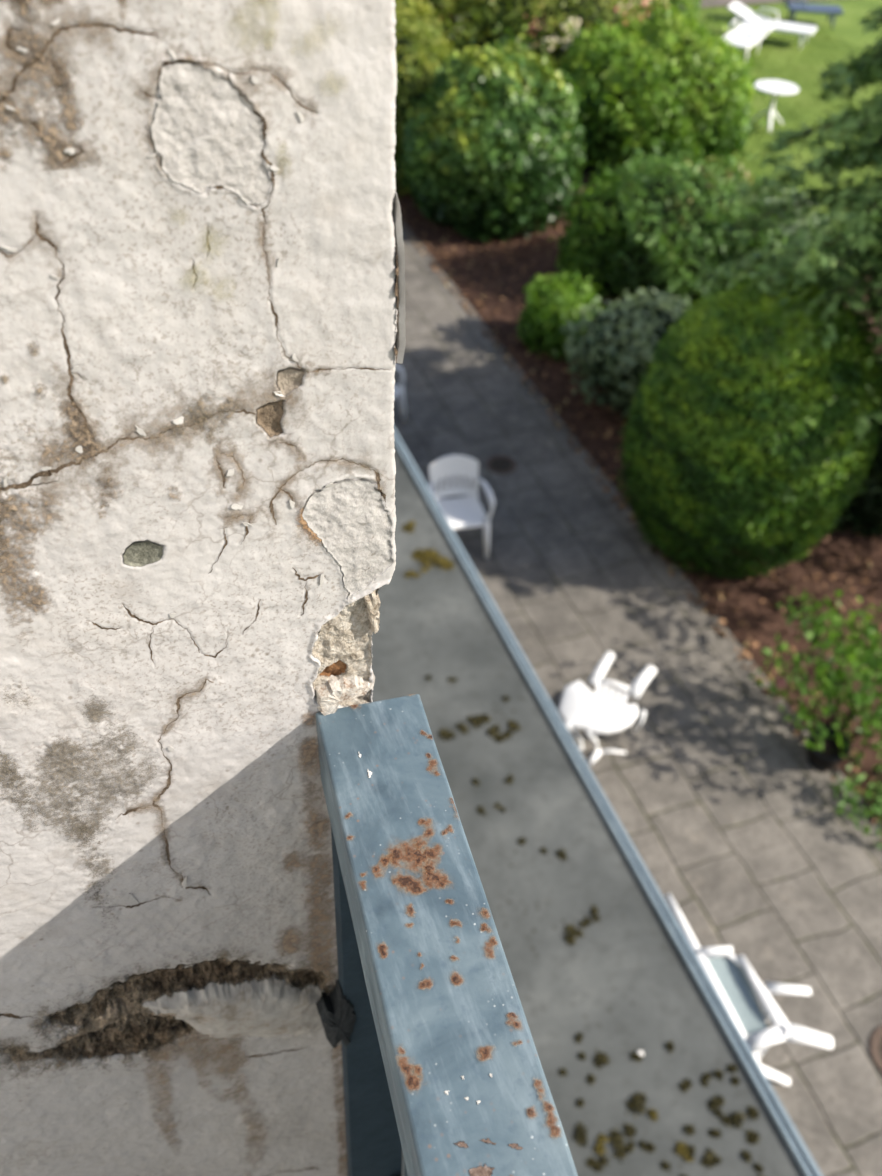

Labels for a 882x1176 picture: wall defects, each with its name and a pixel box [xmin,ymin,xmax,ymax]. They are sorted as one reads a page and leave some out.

leakage [57,58,83,133]
crack [0,0,393,573]
spalling [257,368,305,437]
spalling [123,541,163,567]
crack [293,568,326,616]
spalling [312,588,381,716]
crack [90,601,260,908]
rust [360,798,459,927]
rust [450,920,463,985]
rust [480,908,498,958]
crack [0,1012,31,1020]
rust [527,1080,560,1137]